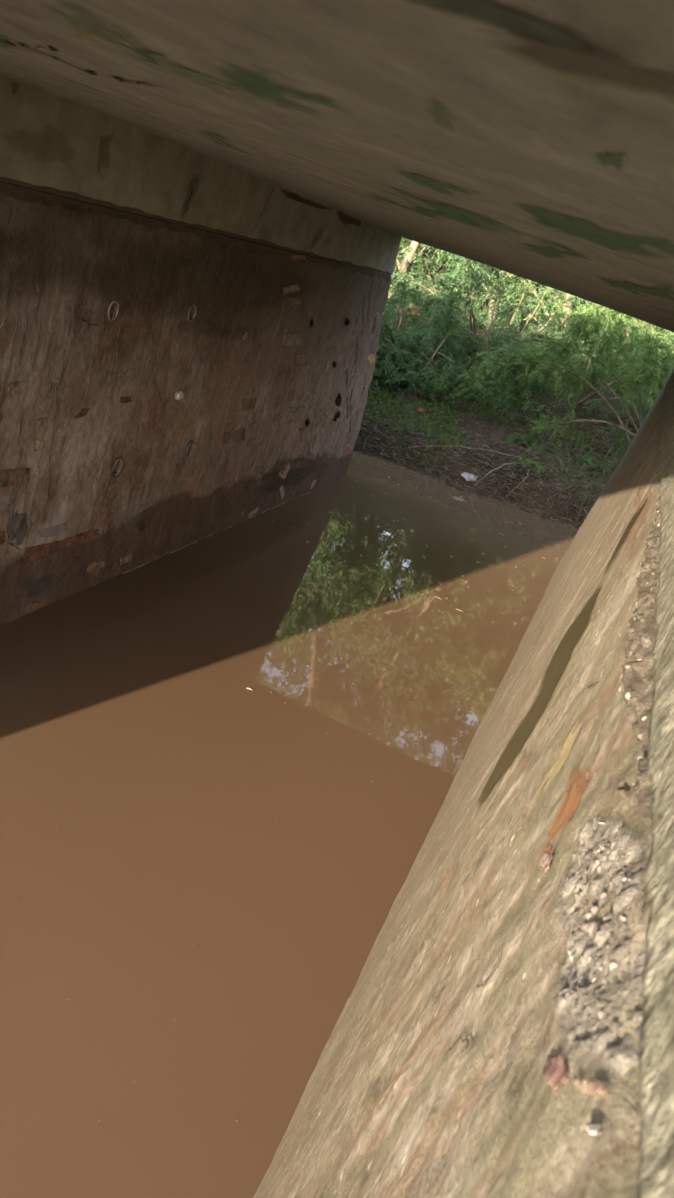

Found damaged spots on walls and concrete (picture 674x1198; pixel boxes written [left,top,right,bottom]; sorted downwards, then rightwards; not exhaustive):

leakage [408,0,674,96]
leakage [283,190,361,226]
rust [540,770,588,868]
spalling [540,497,661,1109]